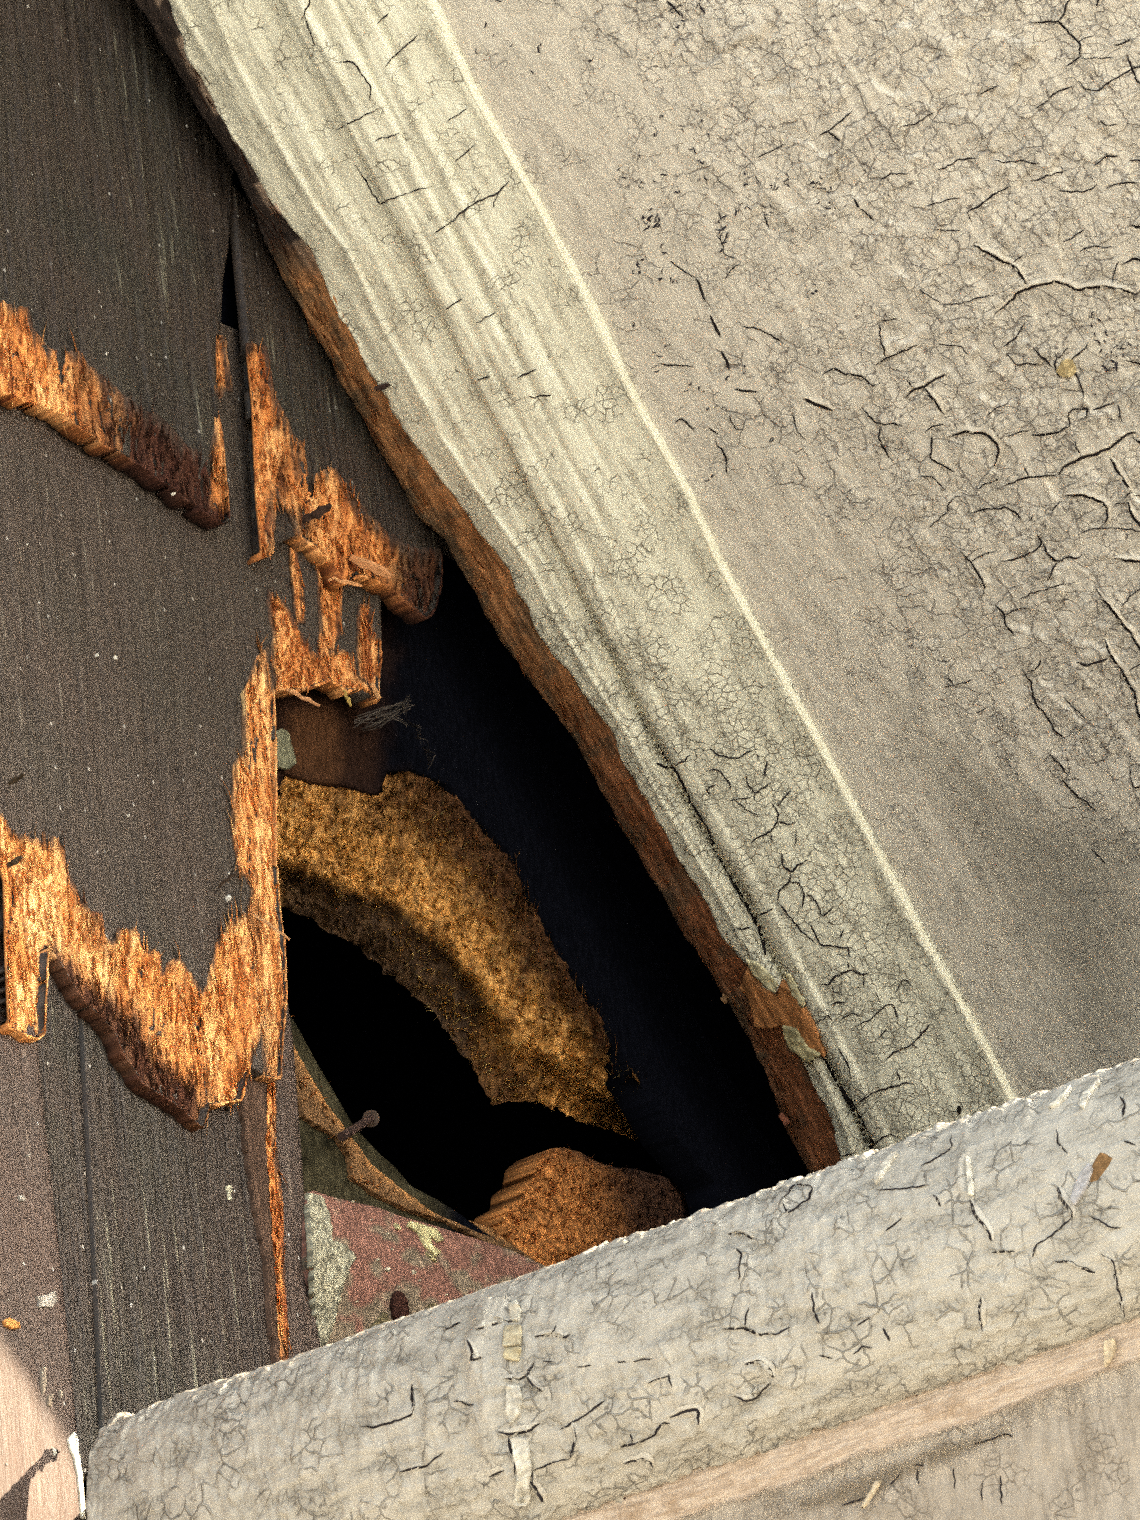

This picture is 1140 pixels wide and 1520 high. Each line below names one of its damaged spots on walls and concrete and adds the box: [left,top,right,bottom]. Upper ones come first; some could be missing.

crack [302,0,474,204]
crack [433,181,509,235]
crack [660,235,781,476]
crack [792,0,1140,812]
peeling [740,959,827,1063]
crack [706,748,931,1106]
peeling [304,1193,357,1347]
peeling [393,1221,444,1263]
peeling [873,1151,899,1185]
crack [872,1130,1125,1316]
crack [361,1385,415,1429]
crack [444,1227,890,1504]